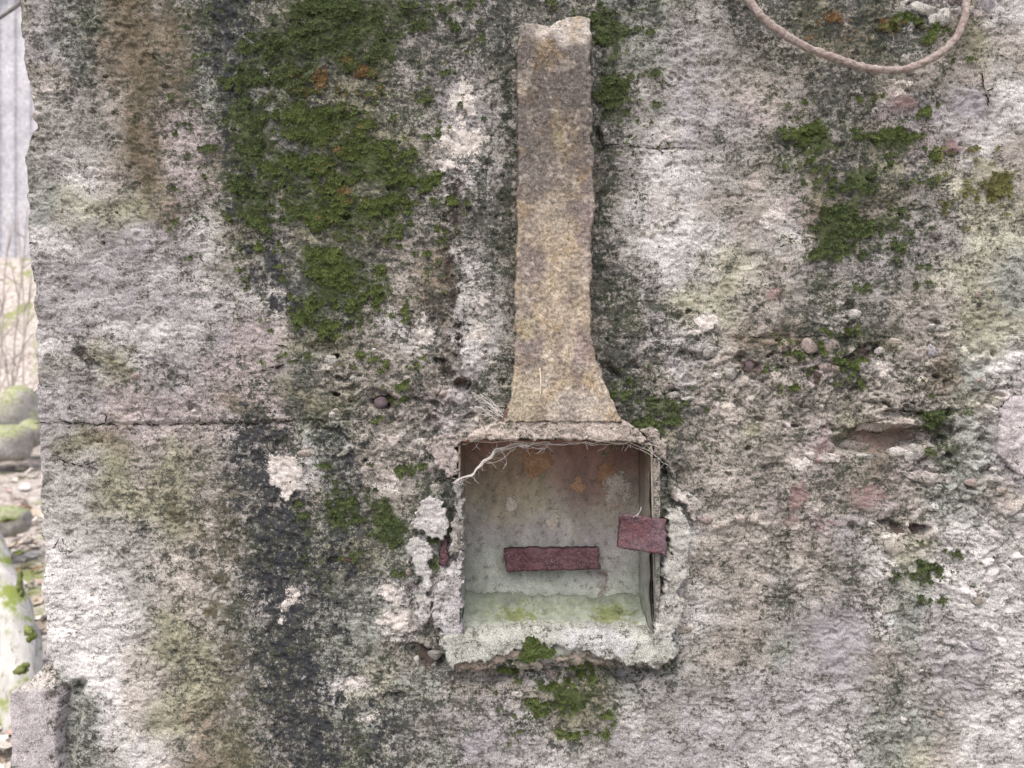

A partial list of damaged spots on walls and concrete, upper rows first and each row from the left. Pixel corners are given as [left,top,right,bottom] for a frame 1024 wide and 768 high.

crack [36,413,362,426]
peeling [851,419,917,432]
peeling [371,419,668,647]
leakage [141,391,415,768]
peeling [652,486,698,672]
peeling [456,649,543,675]
peeling [556,650,612,665]